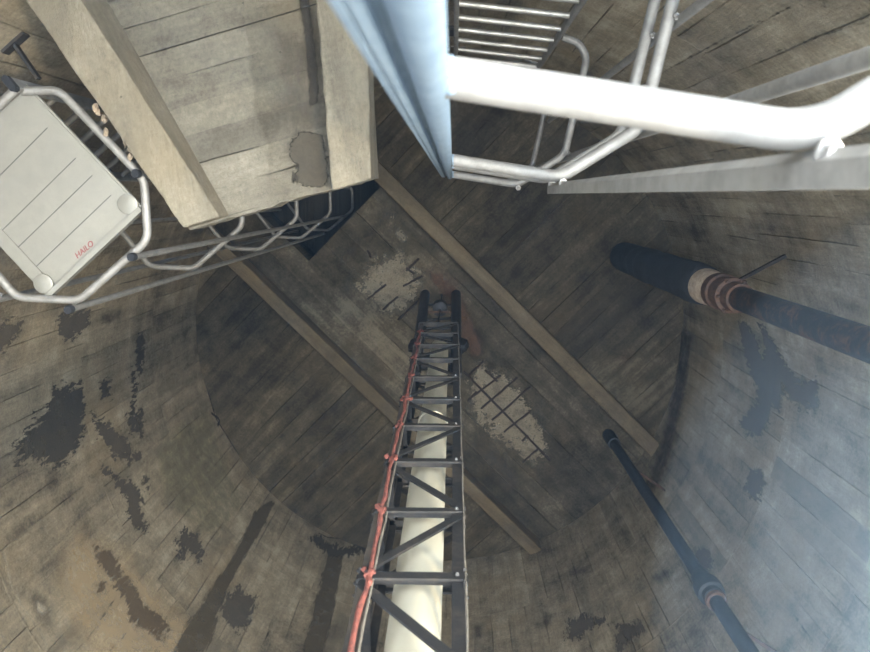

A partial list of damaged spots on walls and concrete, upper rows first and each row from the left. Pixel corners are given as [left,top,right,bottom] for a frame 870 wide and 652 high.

spalling [290,131,329,188]
spalling [353,250,424,321]
water stain [11,377,87,484]
spalling [463,360,551,467]
water stain [738,315,820,442]
water stain [743,468,768,503]
water stain [67,501,274,652]